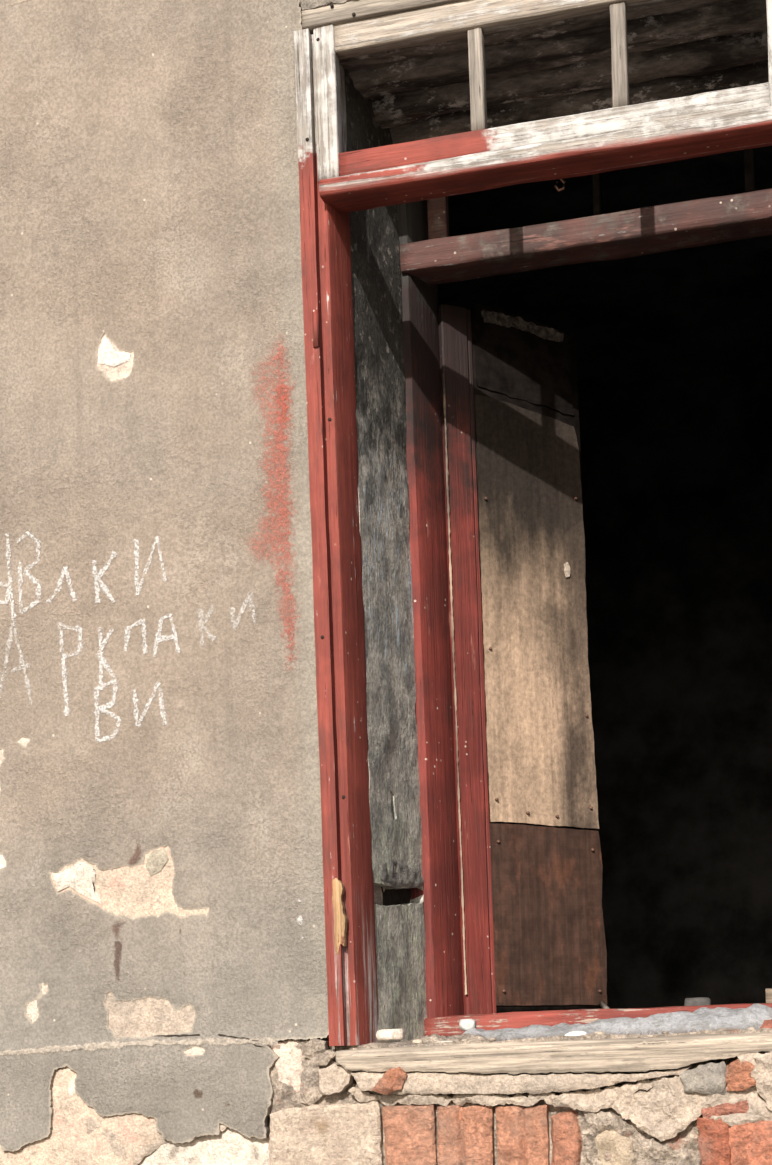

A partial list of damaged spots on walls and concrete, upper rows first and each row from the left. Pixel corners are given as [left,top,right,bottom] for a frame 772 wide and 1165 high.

spalling [300,0,355,11]
flaking render [96,333,134,381]
peeling [49,846,209,919]
flaking render [26,985,48,1023]
peeling [105,992,195,1039]
spalling [0,1038,772,1165]